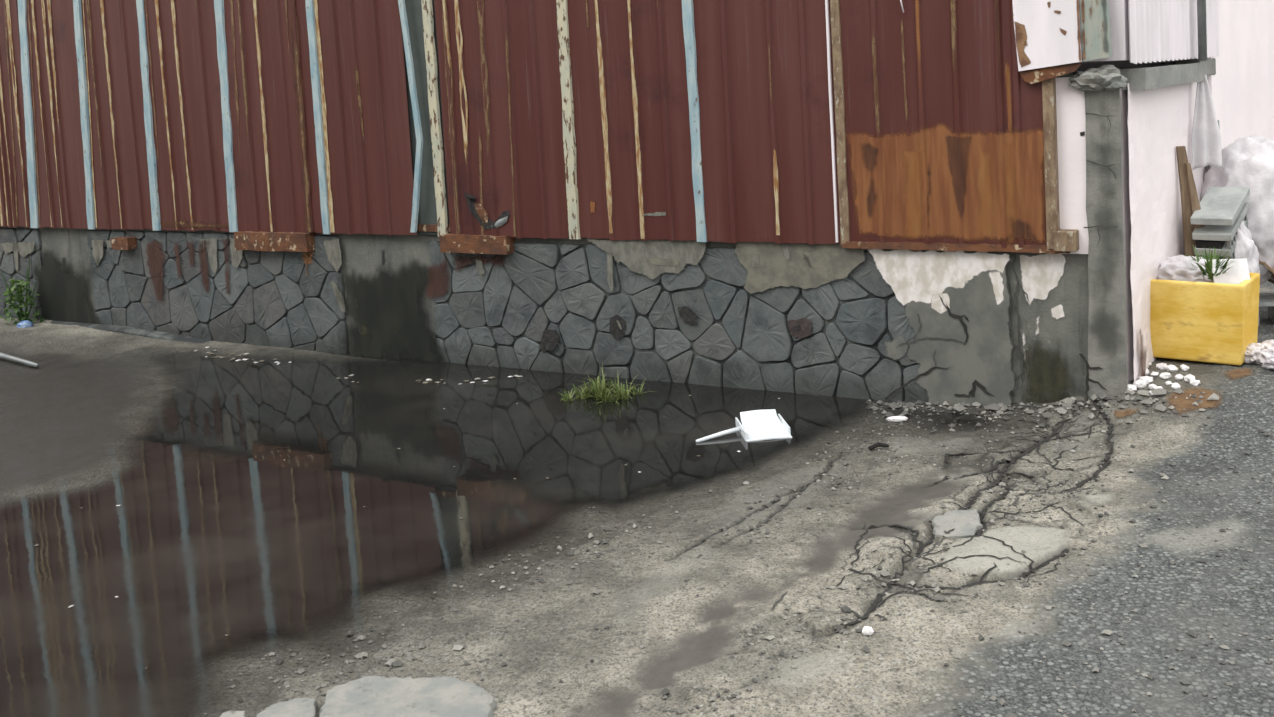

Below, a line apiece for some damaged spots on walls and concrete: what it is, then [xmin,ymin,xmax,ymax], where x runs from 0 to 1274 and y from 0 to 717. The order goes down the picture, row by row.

corrosion [289,0,313,232]
corrosion [846,0,1045,242]
corrosion [1060,0,1085,61]
damp [343,251,443,363]
flaking render [735,149,1066,406]
crack [828,254,1114,635]